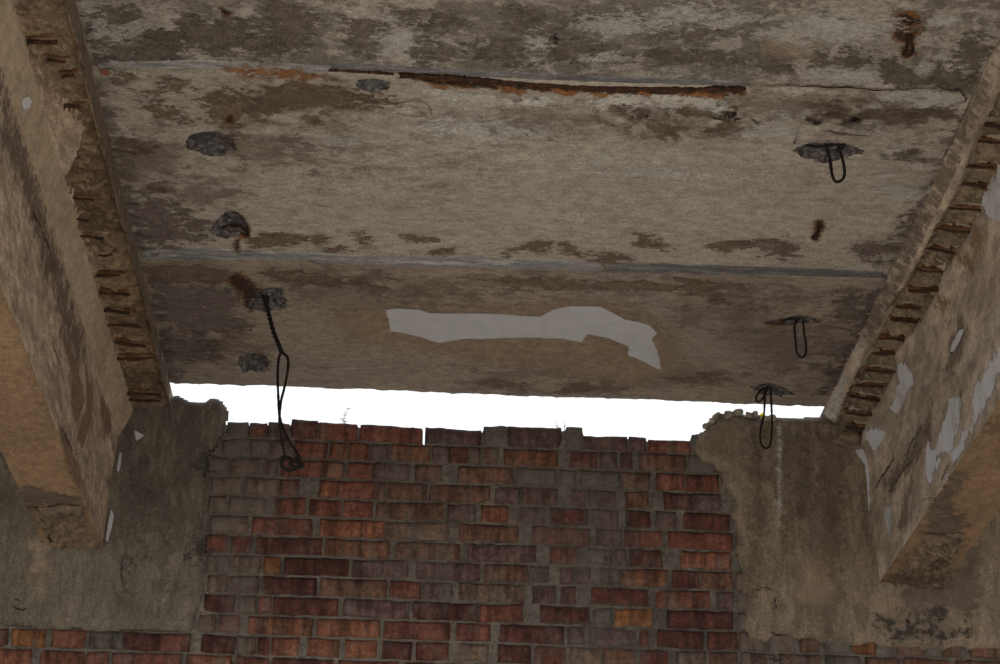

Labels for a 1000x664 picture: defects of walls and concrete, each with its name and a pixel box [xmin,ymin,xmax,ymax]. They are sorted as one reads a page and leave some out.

rust [890,10,924,59]
rust [220,63,747,99]
spalling [186,131,237,157]
spalling [793,143,865,164]
spalling [12,0,171,409]
spalling [209,211,250,239]
water stain [80,0,401,384]
rust [233,212,252,254]
water stain [339,0,995,419]
rust [811,219,825,242]
spalling [833,93,1000,510]
spalling [237,353,271,373]